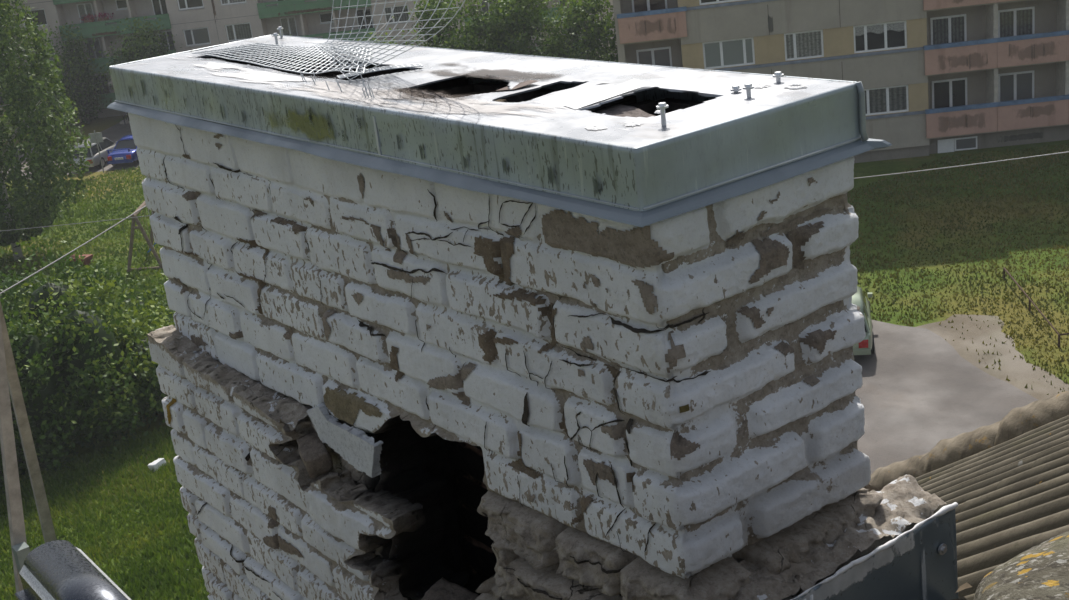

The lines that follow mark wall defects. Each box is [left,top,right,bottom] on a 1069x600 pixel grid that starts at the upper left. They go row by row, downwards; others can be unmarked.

crack [356,318,386,337]
crack [370,260,456,358]
crack [406,189,536,247]
spalling [474,226,568,354]
flaking render [542,209,674,315]
crack [569,312,710,333]
peeling [726,192,833,284]
peeling [774,329,837,356]
flaking render [323,386,383,427]
crack [505,346,710,574]
peeling [263,506,304,559]
crack [503,568,562,600]